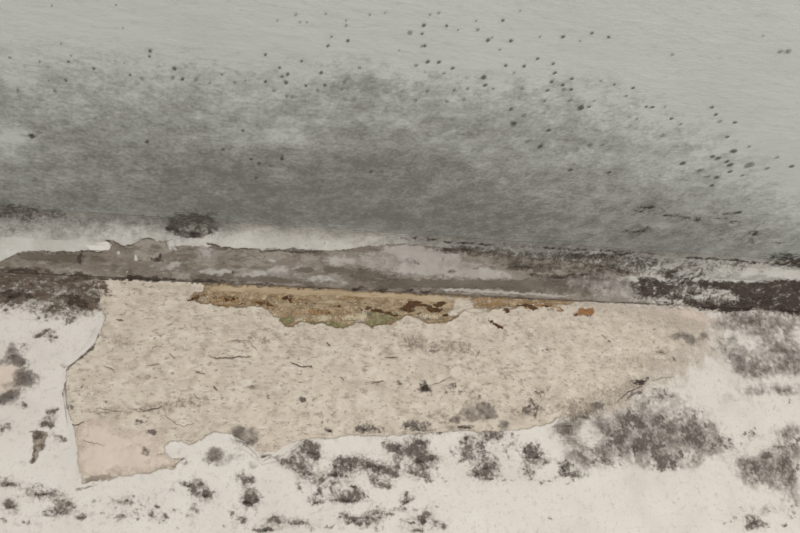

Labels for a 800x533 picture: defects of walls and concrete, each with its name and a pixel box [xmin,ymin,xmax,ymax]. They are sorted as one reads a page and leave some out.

damp [0,267,109,338]
damp [83,141,800,377]
peeling [733,266,800,282]
damp [0,347,32,407]
peeling [0,238,717,490]
damp [183,482,213,510]
damp [238,476,258,507]
damp [254,516,307,533]
damp [277,421,438,504]
damp [408,506,446,532]
damp [451,395,513,480]
damp [552,407,731,480]